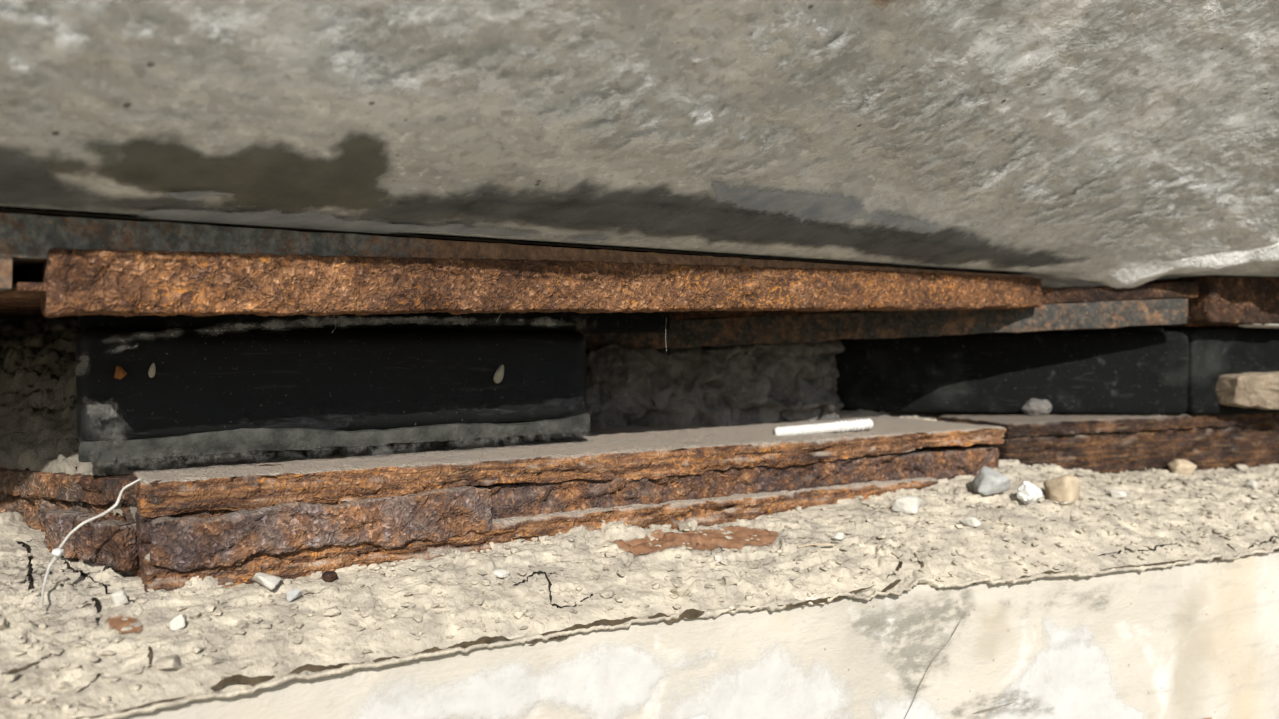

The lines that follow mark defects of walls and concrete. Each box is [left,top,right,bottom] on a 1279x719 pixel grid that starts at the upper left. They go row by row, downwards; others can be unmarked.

damp [0,135,1074,268]
corrosion [614,526,778,556]